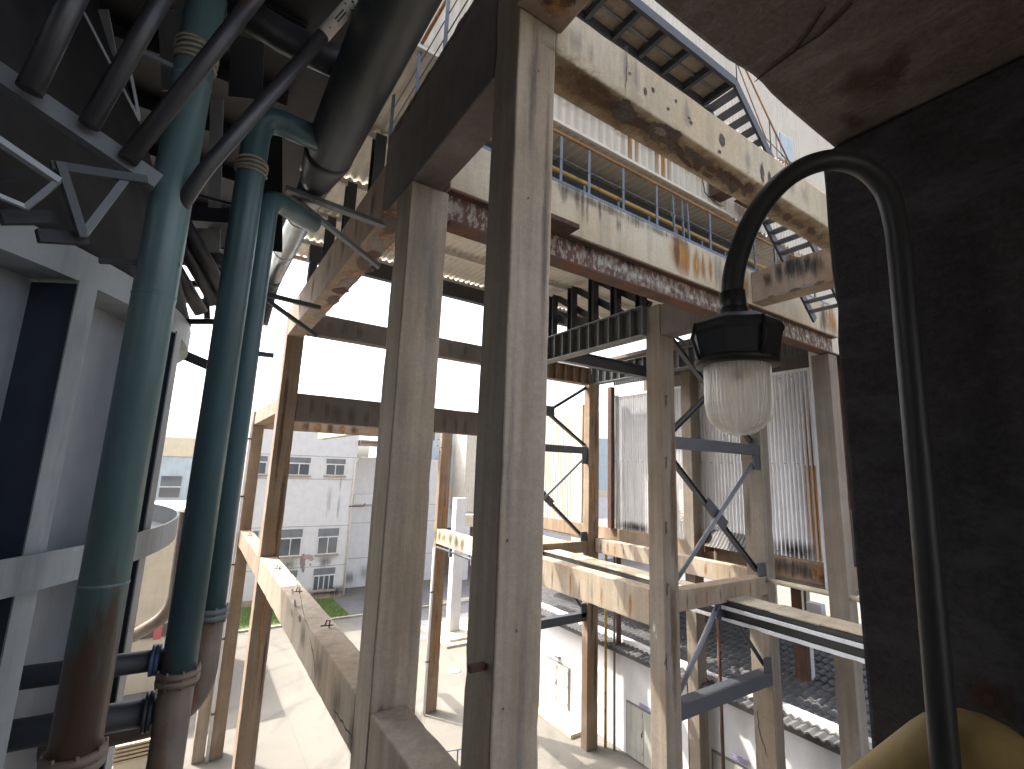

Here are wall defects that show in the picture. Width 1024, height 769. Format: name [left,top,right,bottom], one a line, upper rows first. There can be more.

corrosion [674,243,712,276]
damp [765,202,830,283]